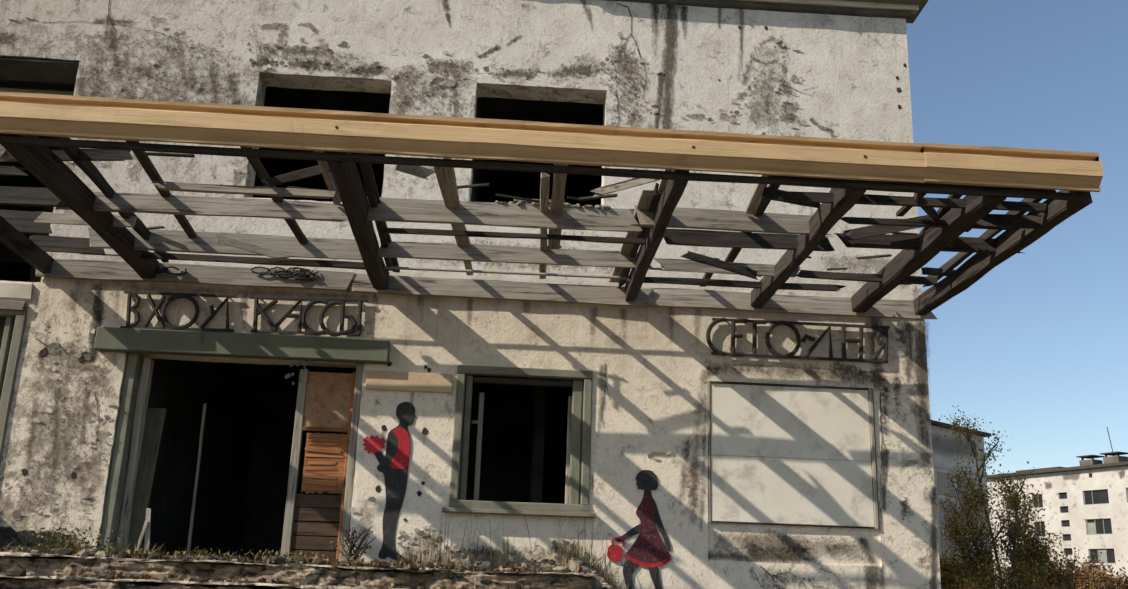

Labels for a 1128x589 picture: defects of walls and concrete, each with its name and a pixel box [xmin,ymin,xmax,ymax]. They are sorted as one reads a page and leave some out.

crack [615,3,646,126]
water stain [651,3,688,129]
peeling [681,26,833,136]
water stain [89,283,103,360]
water stain [904,320,930,455]
water stain [682,396,706,514]
water stain [929,487,938,589]